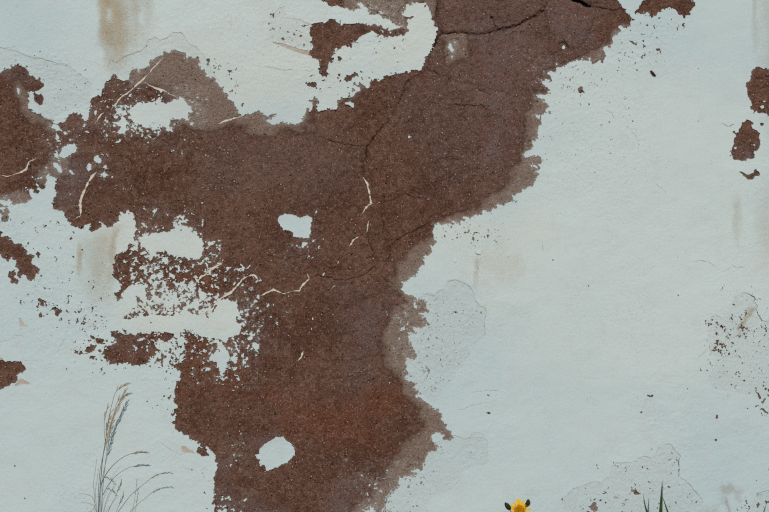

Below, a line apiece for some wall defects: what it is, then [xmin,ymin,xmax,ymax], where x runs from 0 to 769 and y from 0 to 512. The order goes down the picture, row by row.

peeling [635,0,695,30]
peeling [730,67,769,161]
crack [201,3,457,330]
peeling [0,204,11,222]
peeling [0,231,61,284]
peeling [36,295,82,321]
peeling [0,360,26,390]